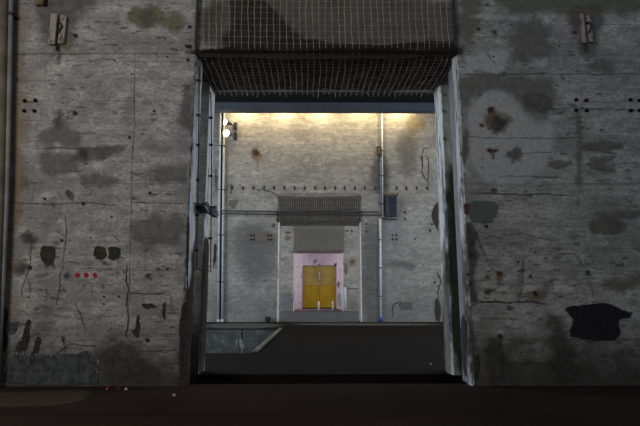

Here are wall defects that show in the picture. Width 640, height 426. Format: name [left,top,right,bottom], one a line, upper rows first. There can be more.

rust [479,107,510,131]
damp [39,111,124,175]
damp [590,211,640,233]
spalling [40,245,55,269]
spalling [93,245,120,260]
crack [15,202,184,351]
crack [472,252,545,312]